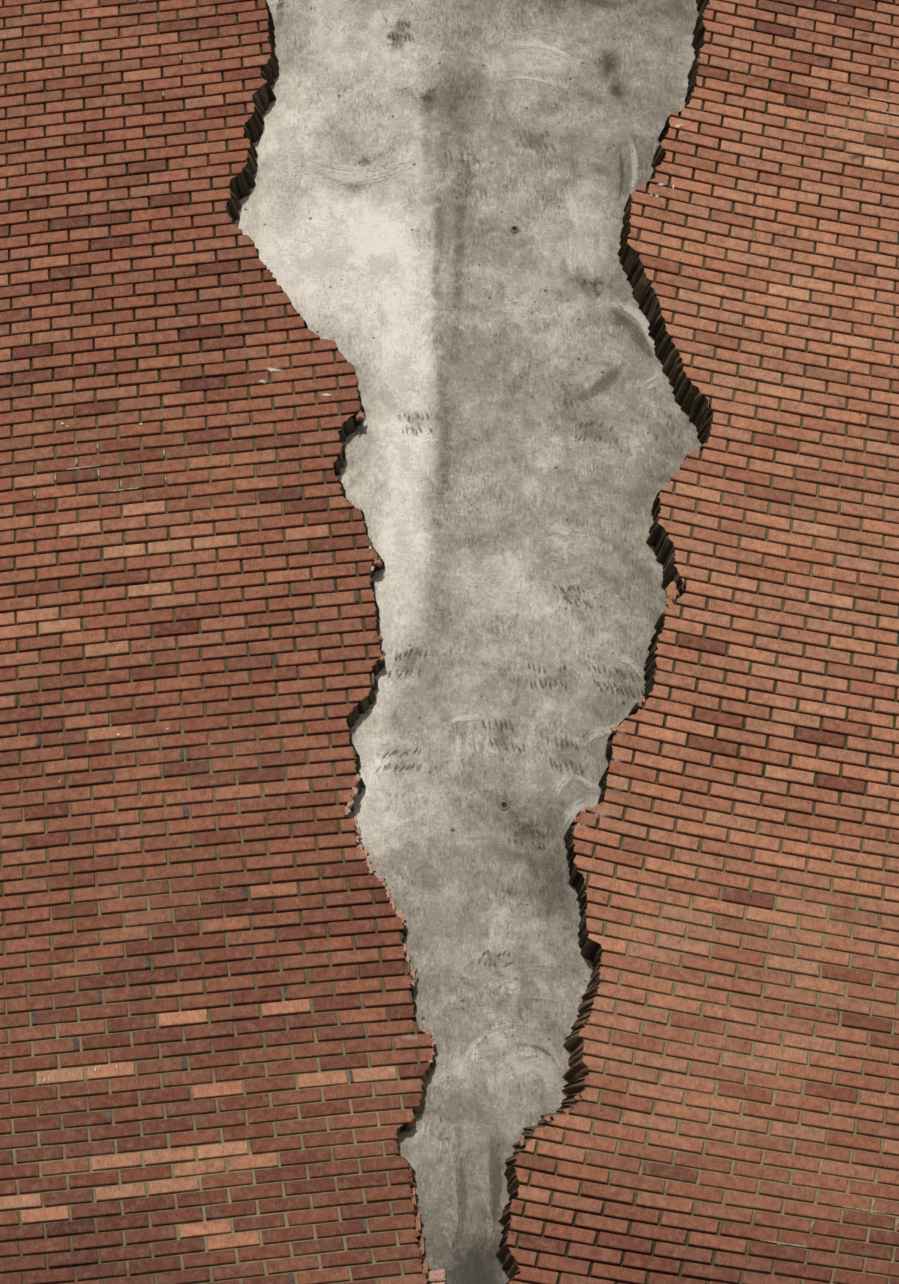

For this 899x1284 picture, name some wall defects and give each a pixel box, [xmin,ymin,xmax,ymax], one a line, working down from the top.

spalling [664,581,680,607]
spalling [345,774,407,924]
spalling [409,1166,446,1284]